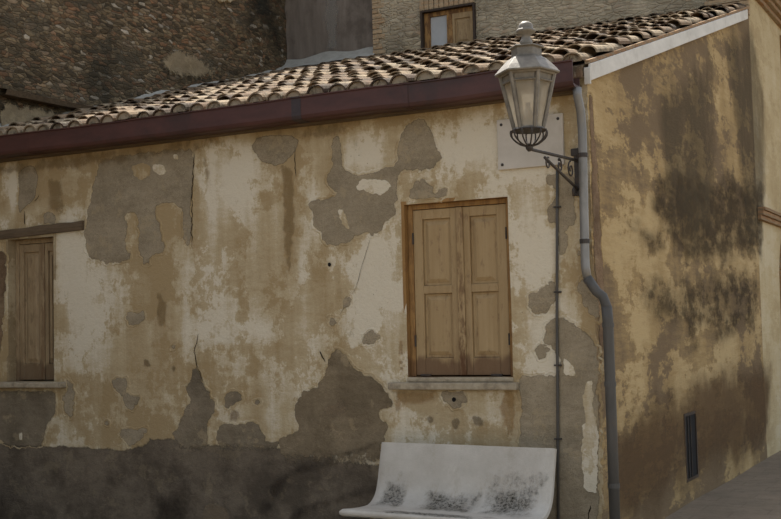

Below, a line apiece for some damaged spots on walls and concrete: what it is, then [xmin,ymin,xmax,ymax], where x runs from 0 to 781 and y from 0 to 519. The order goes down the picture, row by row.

peeling [82,146,197,268]
peeling [252,135,298,166]
peeling [306,115,449,250]
leakage [655,176,763,260]
spalling [0,243,9,358]
peeling [515,91,605,519]
spalling [0,388,58,449]
peeling [172,346,396,469]